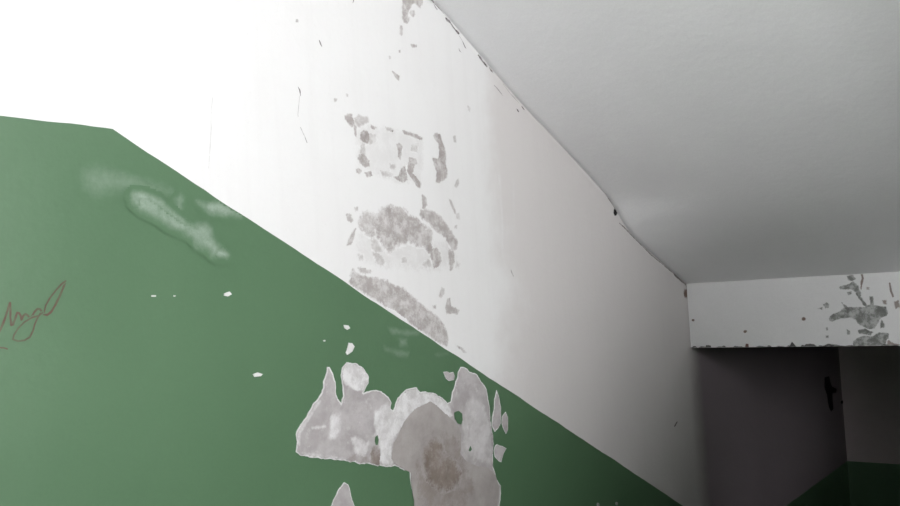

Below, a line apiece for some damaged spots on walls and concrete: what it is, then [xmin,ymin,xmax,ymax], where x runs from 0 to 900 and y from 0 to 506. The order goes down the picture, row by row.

peeling [388,0,433,82]
water stain [74,155,246,266]
peeling [344,112,461,230]
peeling [347,265,468,354]
peeling [691,274,900,348]
peeling [296,343,508,506]